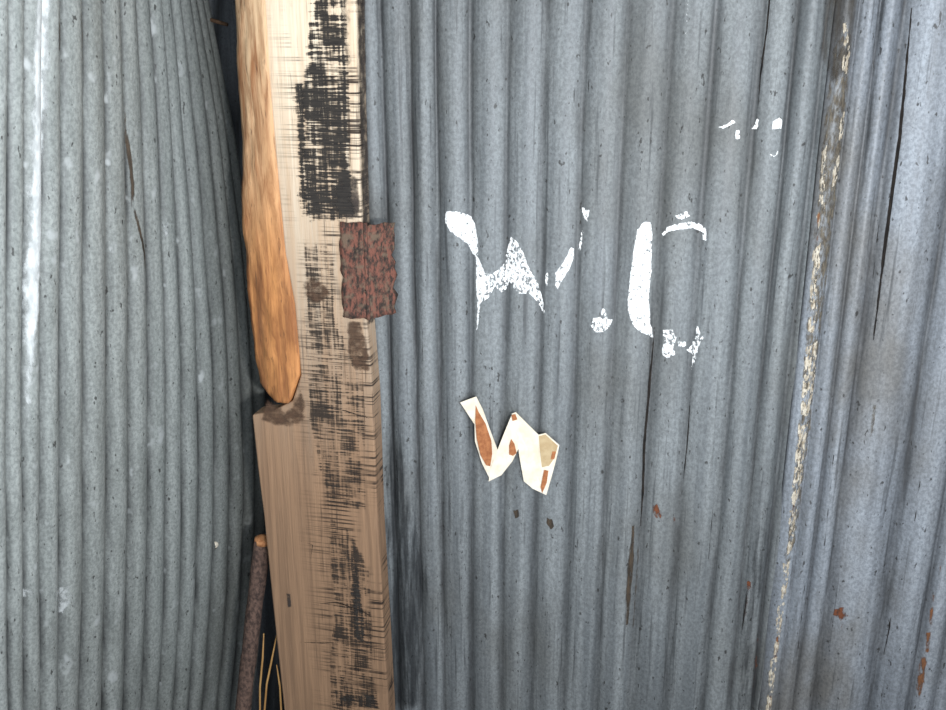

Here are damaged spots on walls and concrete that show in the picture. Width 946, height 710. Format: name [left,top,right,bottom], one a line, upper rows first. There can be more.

peeling [482,237,548,311]
peeling [662,329,686,358]
corrosion [916,595,934,696]